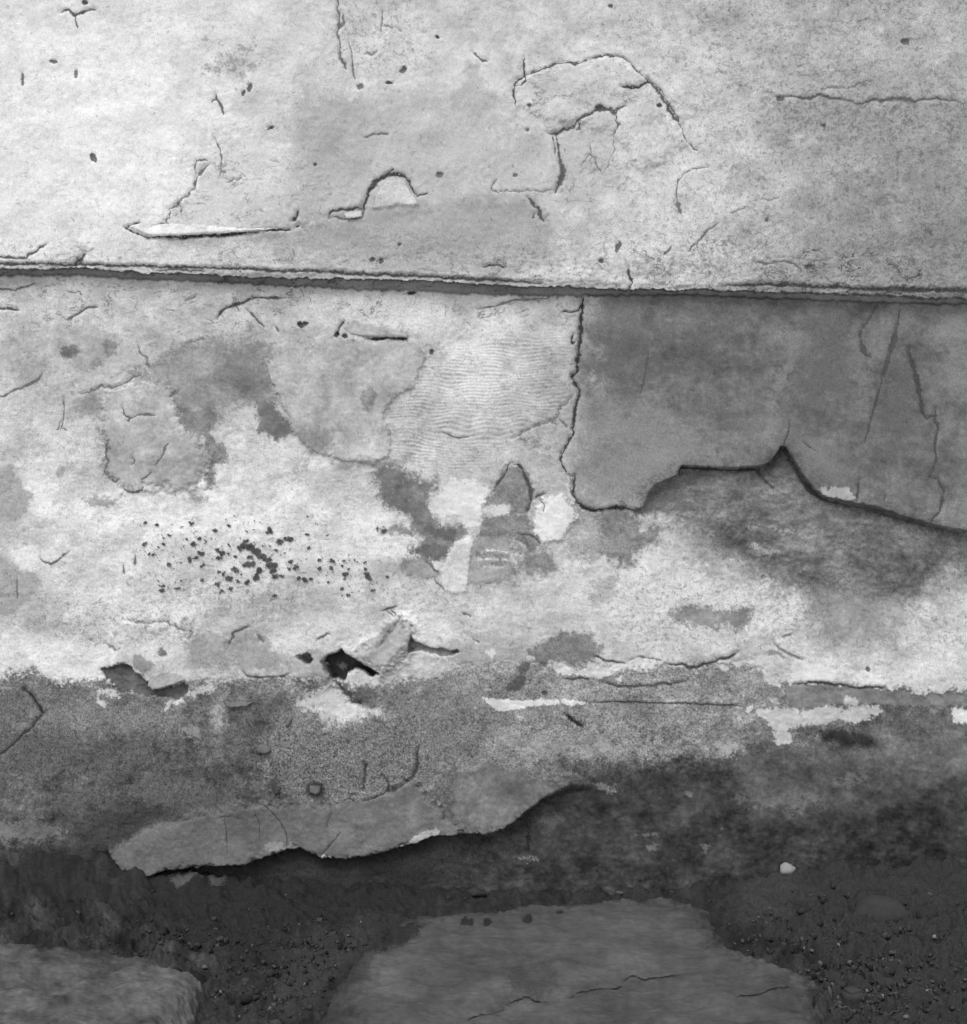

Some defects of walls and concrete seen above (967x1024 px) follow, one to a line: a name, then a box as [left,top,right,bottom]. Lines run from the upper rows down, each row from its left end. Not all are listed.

crack [491,54,707,221]
crack [775,80,963,104]
crack [0,244,635,512]
flaking render [559,288,967,609]
leakage [133,513,389,604]
leakage [331,457,511,594]
crack [1,690,43,754]
flaking render [101,647,188,700]
flaking render [289,648,378,708]
leakage [285,642,468,735]
leakage [449,654,967,895]
flaking render [109,778,463,877]